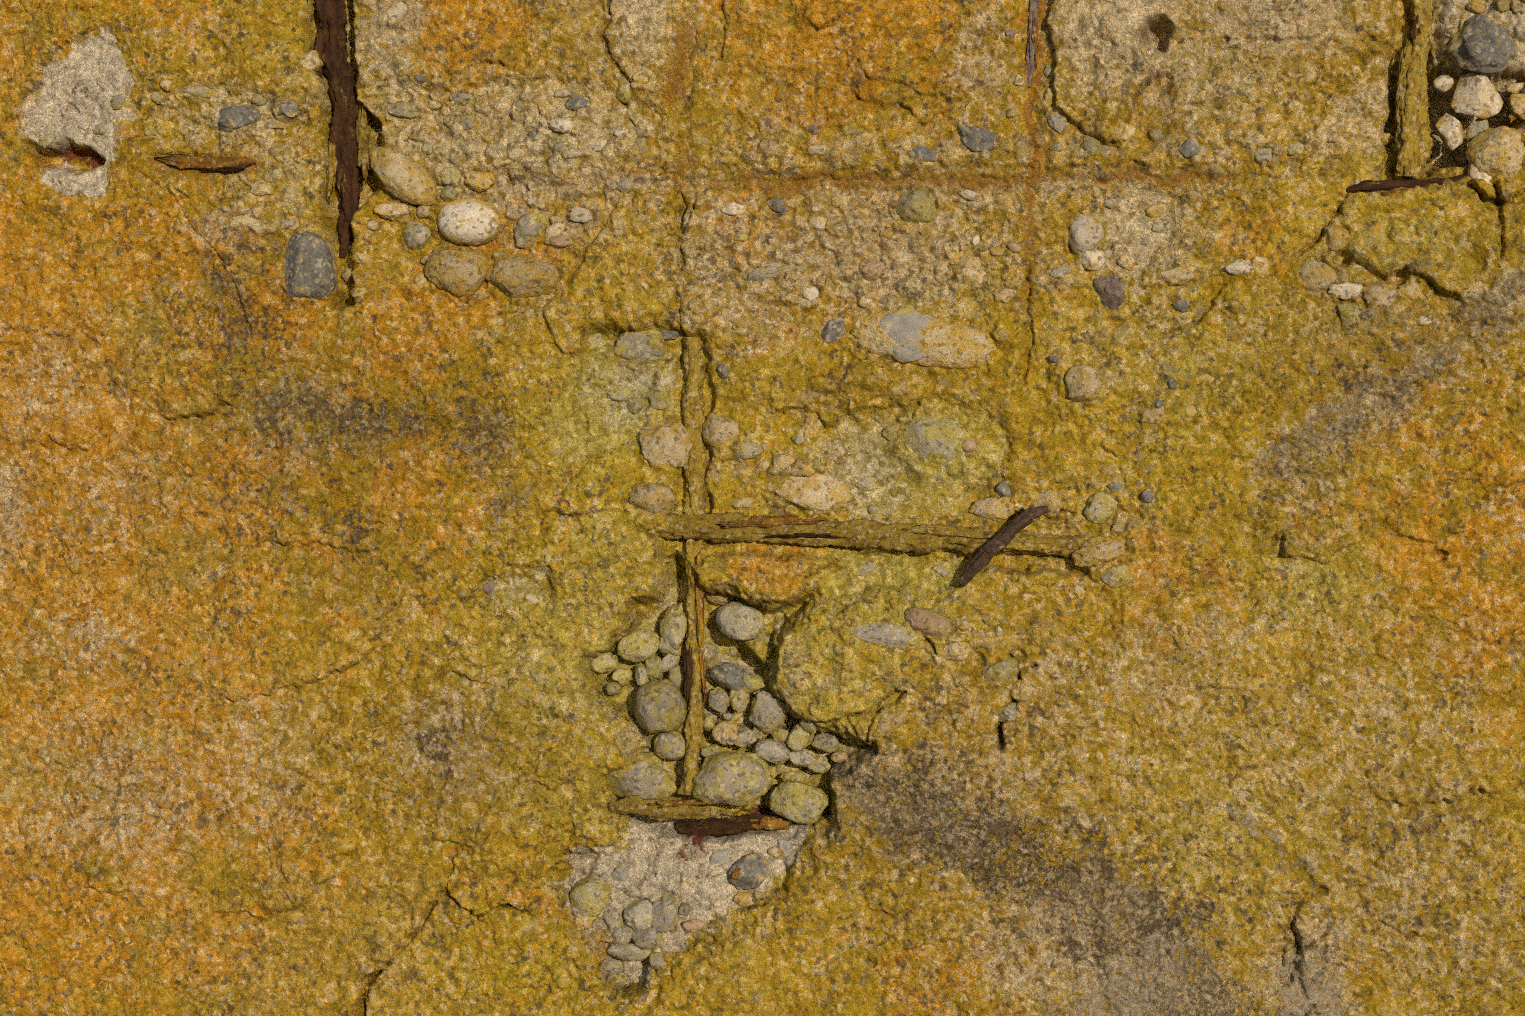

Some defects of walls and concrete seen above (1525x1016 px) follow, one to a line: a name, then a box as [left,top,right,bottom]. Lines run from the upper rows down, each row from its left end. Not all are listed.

spalling [15,20,308,199]
corrosion [132,151,263,180]
corrosion [307,0,371,258]
corrosion [671,0,1060,312]
spalling [1424,0,1525,172]
crack [1468,184,1505,223]
spalling [537,320,686,465]
corrosion [609,337,1082,861]
spalling [544,548,968,1002]